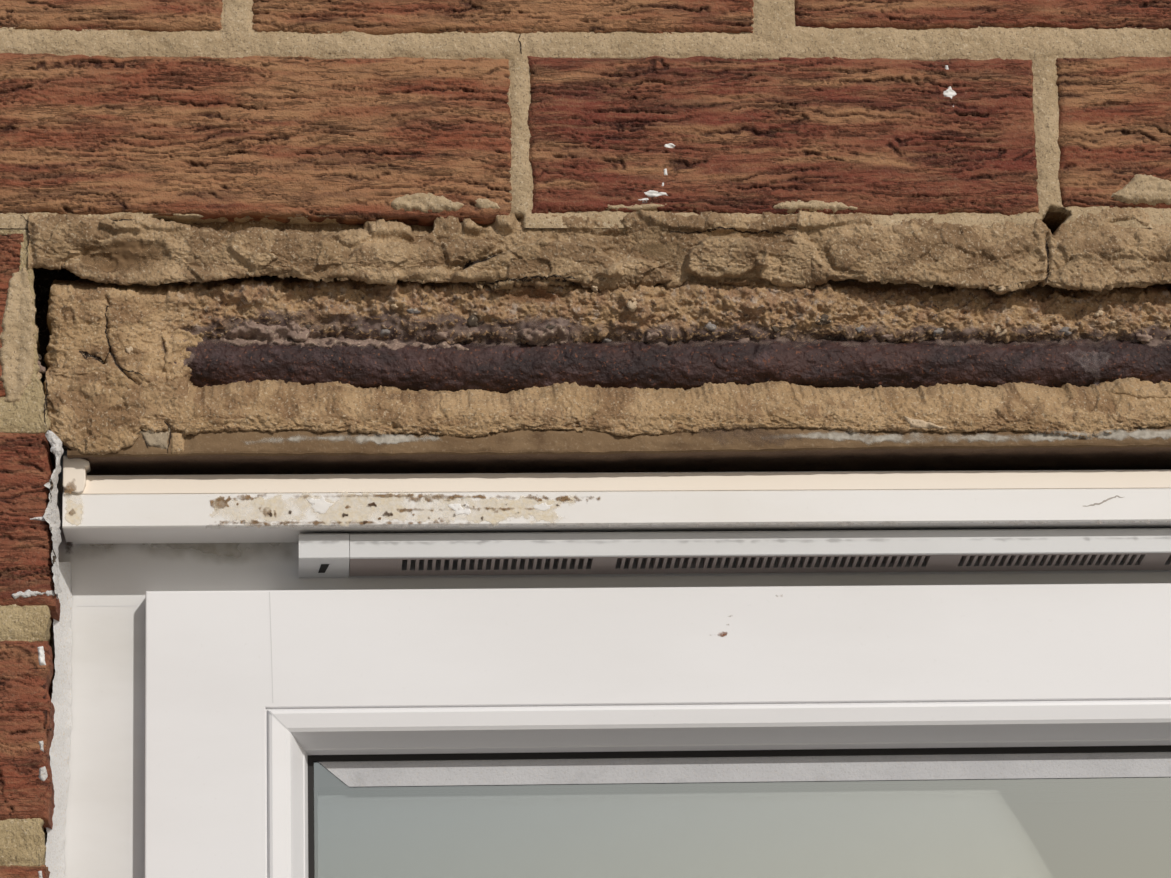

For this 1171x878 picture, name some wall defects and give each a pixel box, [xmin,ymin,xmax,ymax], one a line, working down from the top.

crack [1043,235,1051,282]
crack [79,298,143,384]
spalling [44,276,1171,458]